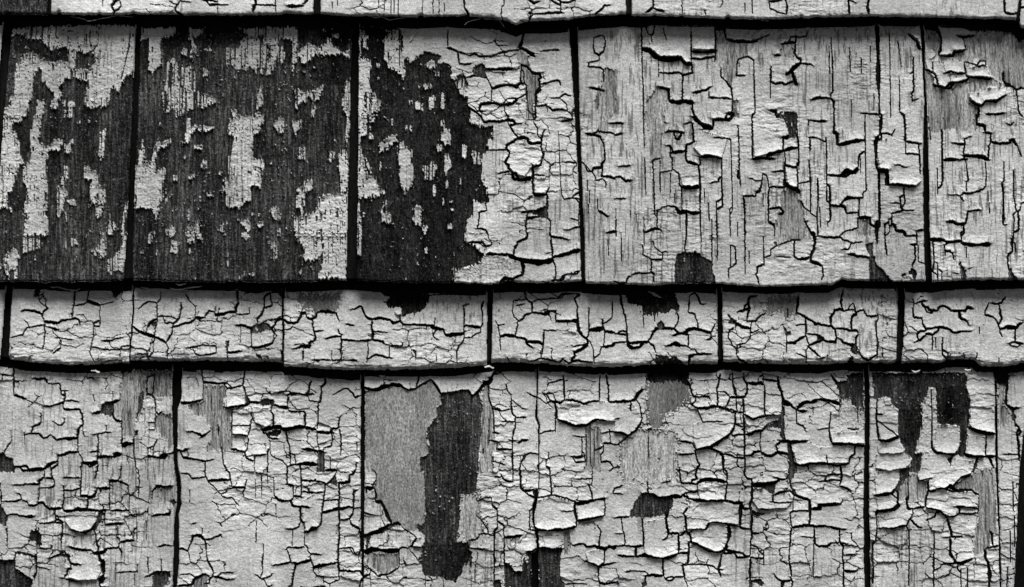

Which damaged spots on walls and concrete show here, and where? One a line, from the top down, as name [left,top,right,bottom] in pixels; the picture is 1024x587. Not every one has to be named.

crack [332,0,399,16]
peeling [455,63,486,99]
peeling [517,49,541,121]
peeling [0,0,481,298]
peeling [507,139,549,219]
crack [447,28,1024,373]
peeling [453,230,522,285]
peeling [674,251,716,284]
peeling [410,386,497,581]
crack [0,292,1022,587]
peeling [558,343,1019,558]
peeling [365,525,400,574]